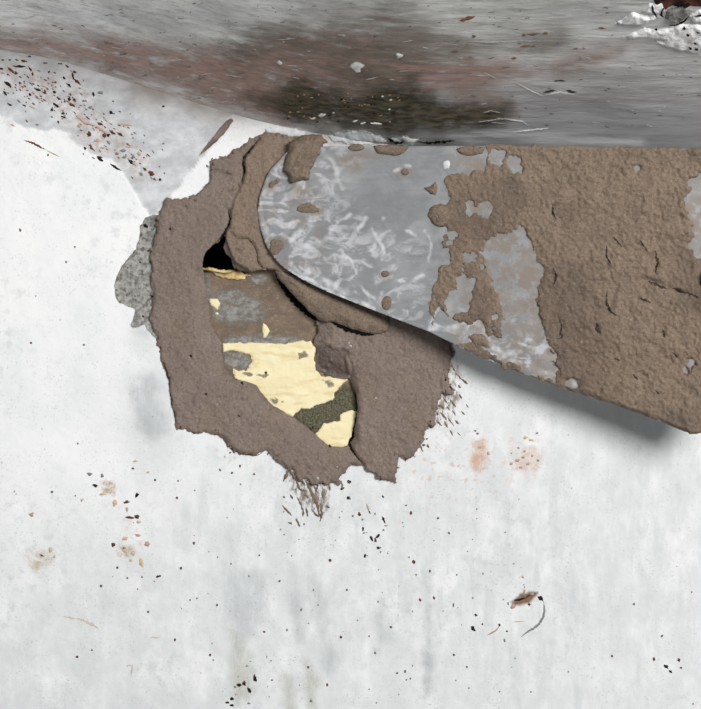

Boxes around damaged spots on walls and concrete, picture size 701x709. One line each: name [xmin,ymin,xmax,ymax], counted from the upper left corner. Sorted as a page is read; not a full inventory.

leakage [0,16,517,136]
spalling [199,118,233,156]
flaking render [114,215,158,337]
crack [214,211,275,272]
flaking render [203,267,357,447]